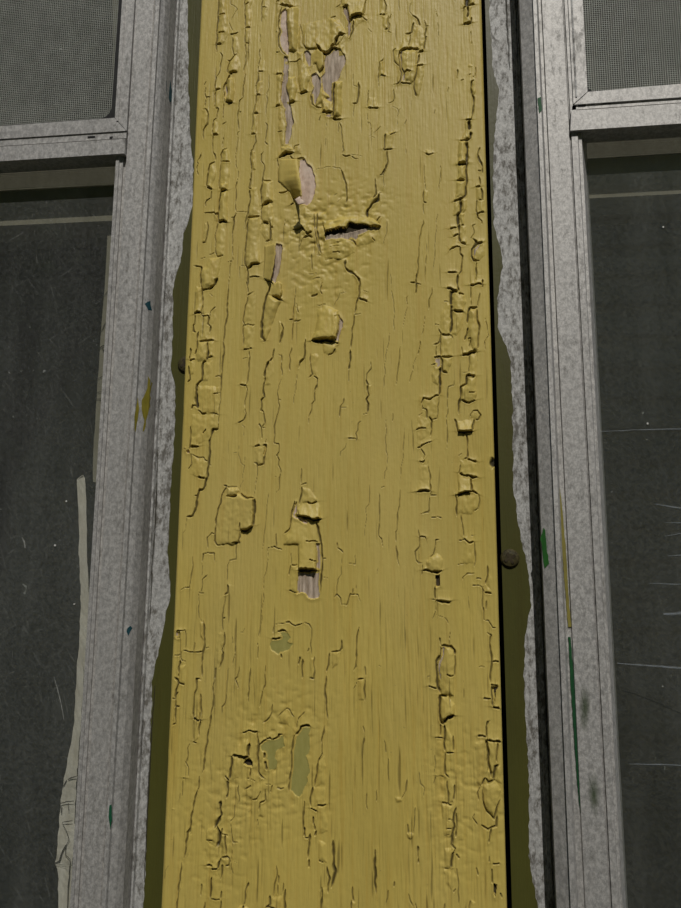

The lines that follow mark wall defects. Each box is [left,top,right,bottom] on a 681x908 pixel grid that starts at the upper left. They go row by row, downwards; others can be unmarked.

peeling [391,19,430,86]
crack [433,64,477,115]
peeling [238,0,380,342]
peeling [309,306,343,357]
crack [162,0,456,908]
peeling [282,467,330,598]
crack [461,563,499,629]
peeling [425,635,476,908]
peeling [471,630,503,844]
crack [487,836,504,899]